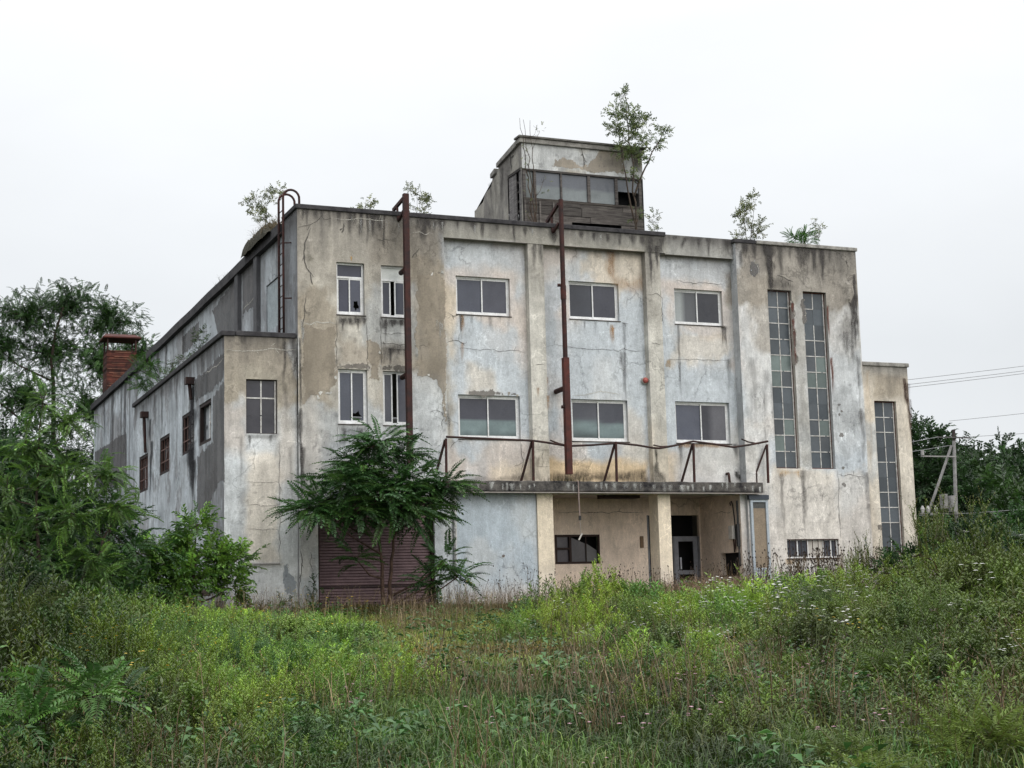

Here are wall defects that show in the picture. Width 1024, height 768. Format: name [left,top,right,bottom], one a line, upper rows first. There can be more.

peeling [554,151,624,174]
crack [207,211,388,372]
water stain [740,244,786,290]
water stain [797,247,824,275]
water stain [843,274,858,342]
peeling [301,271,448,422]
water stain [184,370,196,489]
water stain [557,450,664,490]